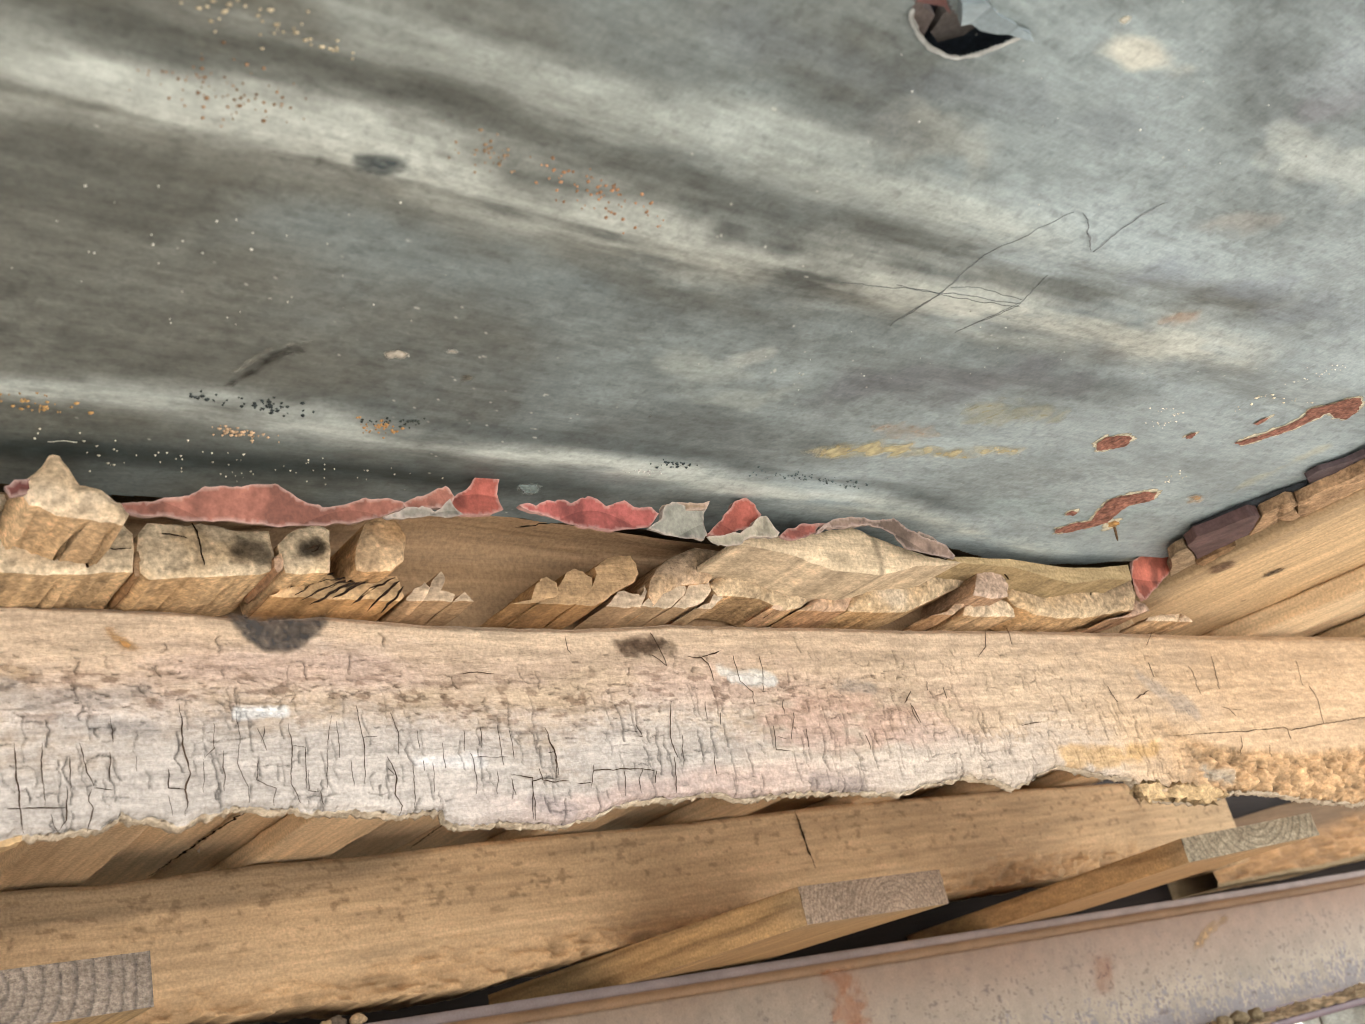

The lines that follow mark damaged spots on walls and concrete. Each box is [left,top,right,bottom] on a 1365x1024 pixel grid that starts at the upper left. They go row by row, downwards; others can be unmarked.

damp [356,156,404,175]
peeling [707,498,761,536]
peeling [779,523,825,541]
crack [905,687,947,723]
crack [1172,657,1365,757]
crack [8,633,809,876]
crack [795,813,816,868]